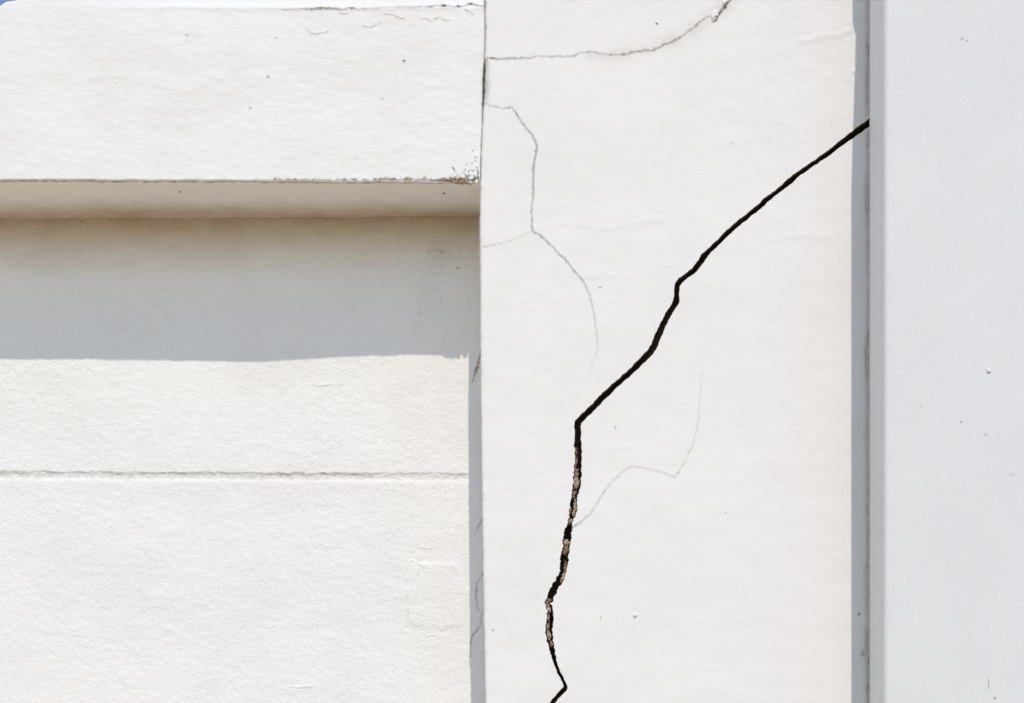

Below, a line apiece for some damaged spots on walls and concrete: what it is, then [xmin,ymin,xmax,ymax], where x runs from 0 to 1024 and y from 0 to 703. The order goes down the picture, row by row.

crack [545,118,870,703]